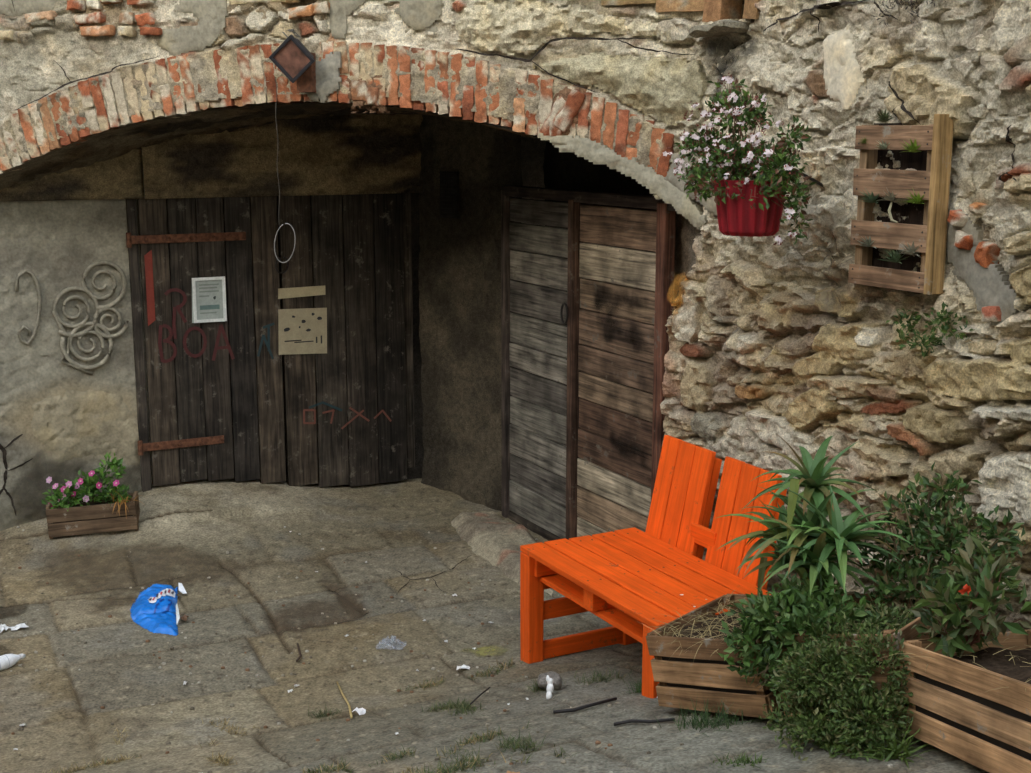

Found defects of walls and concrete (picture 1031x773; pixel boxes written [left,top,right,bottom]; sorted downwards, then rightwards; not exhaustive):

spalling [0,0,390,113]
peeling [823,27,868,109]
peeling [946,202,1029,329]
crack [0,434,33,515]
crack [394,555,471,595]